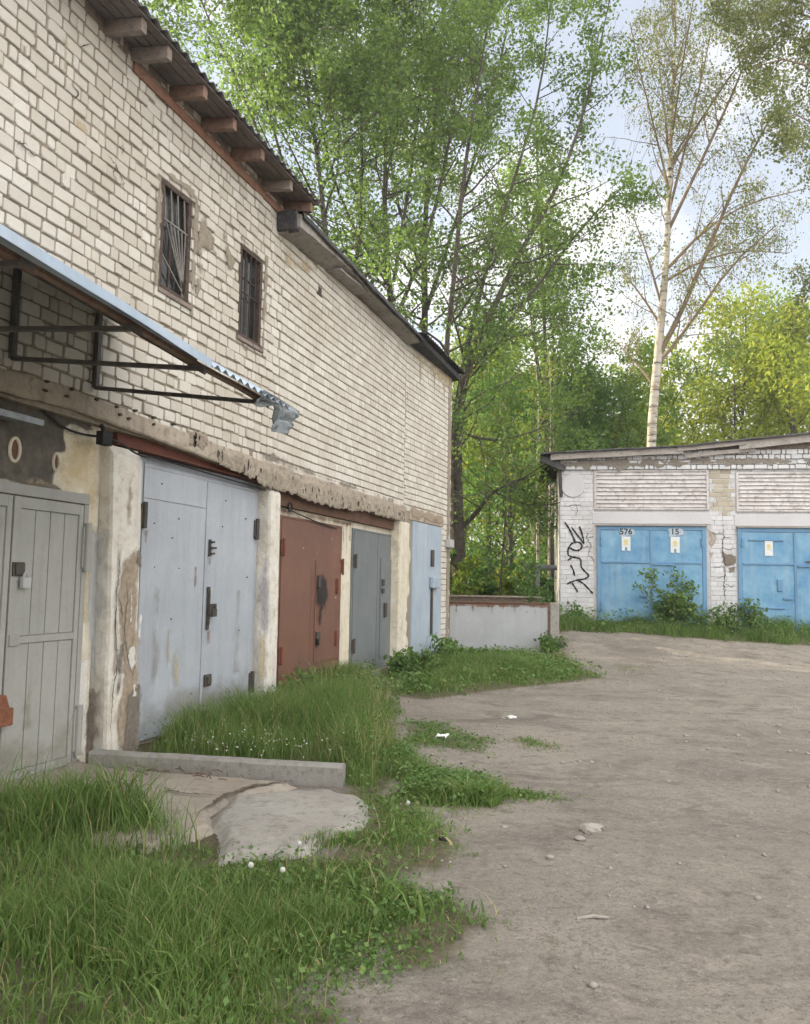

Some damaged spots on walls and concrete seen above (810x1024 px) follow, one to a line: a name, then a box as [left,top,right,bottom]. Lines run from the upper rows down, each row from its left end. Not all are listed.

spalling [171,423,407,521]
peeling [709,532,736,572]
crack [711,519,737,608]
crack [160,780,287,811]